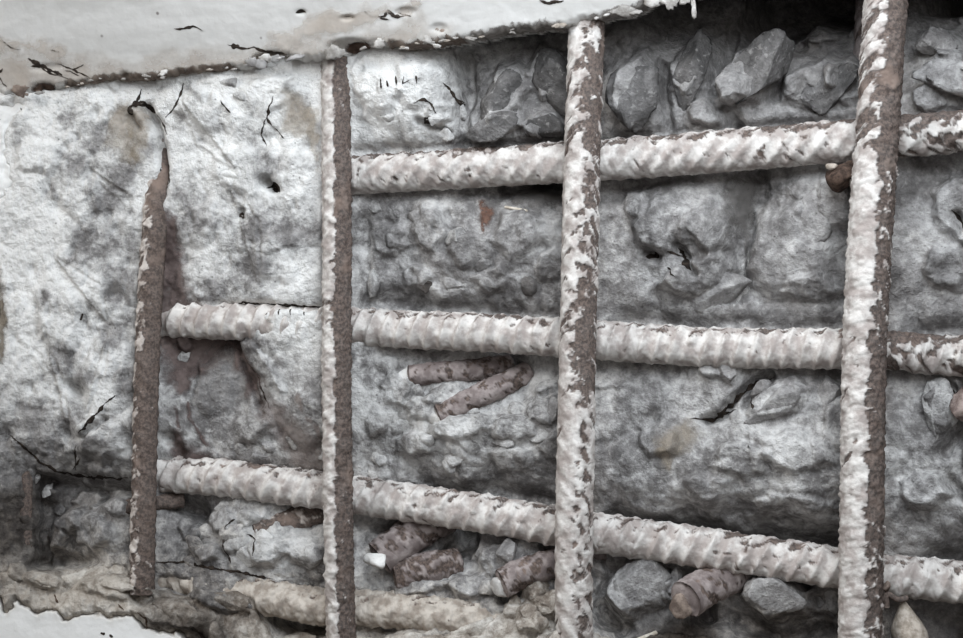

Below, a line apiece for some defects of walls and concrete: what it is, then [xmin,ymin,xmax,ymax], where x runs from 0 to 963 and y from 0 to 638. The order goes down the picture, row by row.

crack [10,395,127,481]
spalling [0,20,568,638]
crack [691,377,774,423]
spalling [547,0,963,638]